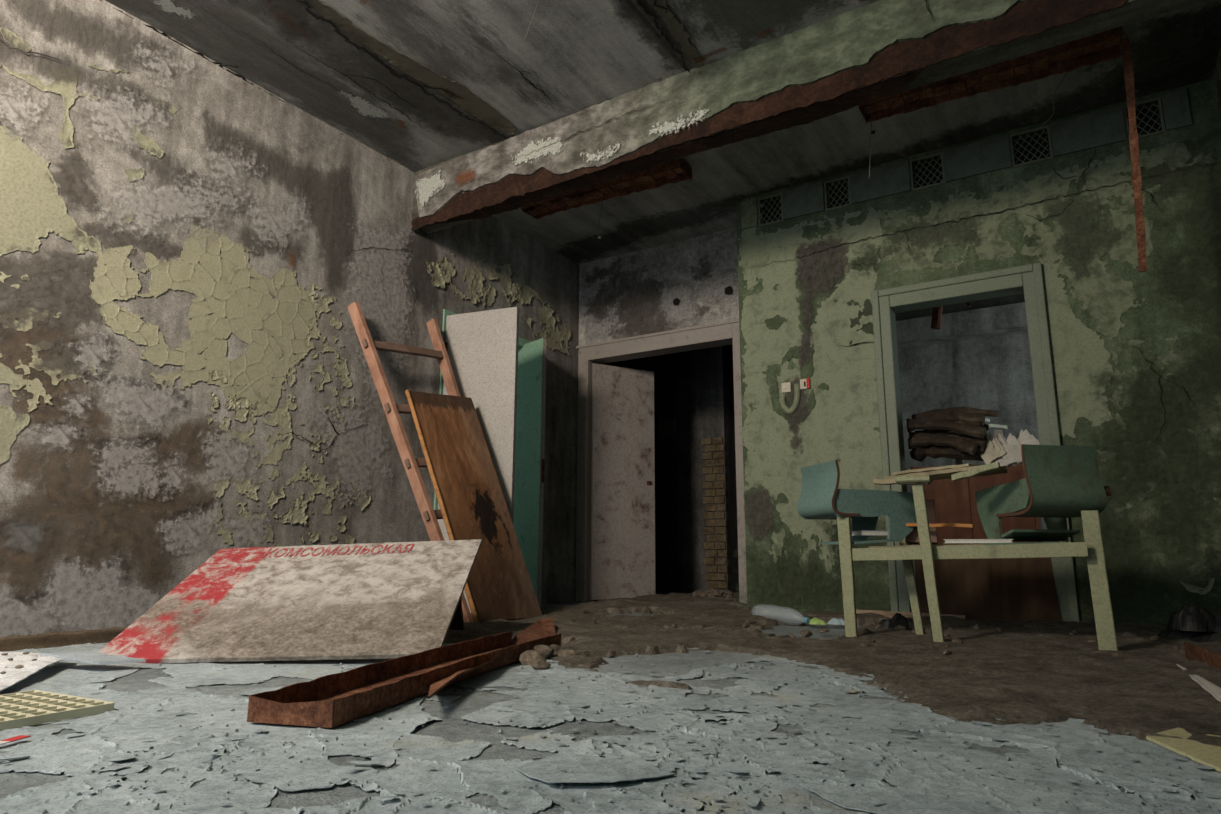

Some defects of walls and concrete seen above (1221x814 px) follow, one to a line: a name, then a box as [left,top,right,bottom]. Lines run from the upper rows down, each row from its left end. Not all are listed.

crack [100,0,284,102]
crack [254,0,671,169]
crack [637,0,690,73]
spalling [411,0,1128,231]
damp [558,0,1221,338]
peeling [0,125,371,547]
damp [0,0,438,638]
peeling [426,253,573,355]
damp [785,214,980,448]
damp [1099,135,1221,624]
damp [740,489,891,613]
peeling [0,643,1221,814]